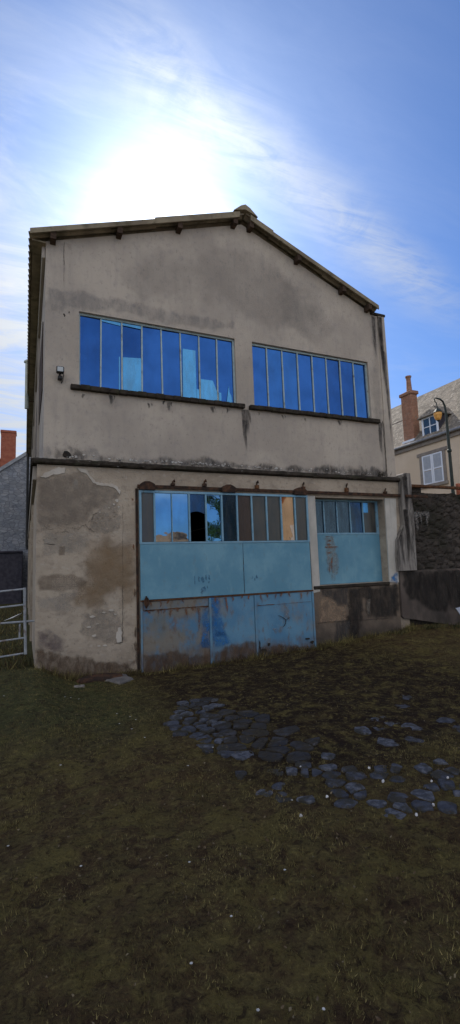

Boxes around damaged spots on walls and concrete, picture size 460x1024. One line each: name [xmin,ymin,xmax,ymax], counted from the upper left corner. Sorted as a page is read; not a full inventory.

water stain [350,317,391,477]
flaking render [40,451,120,523]